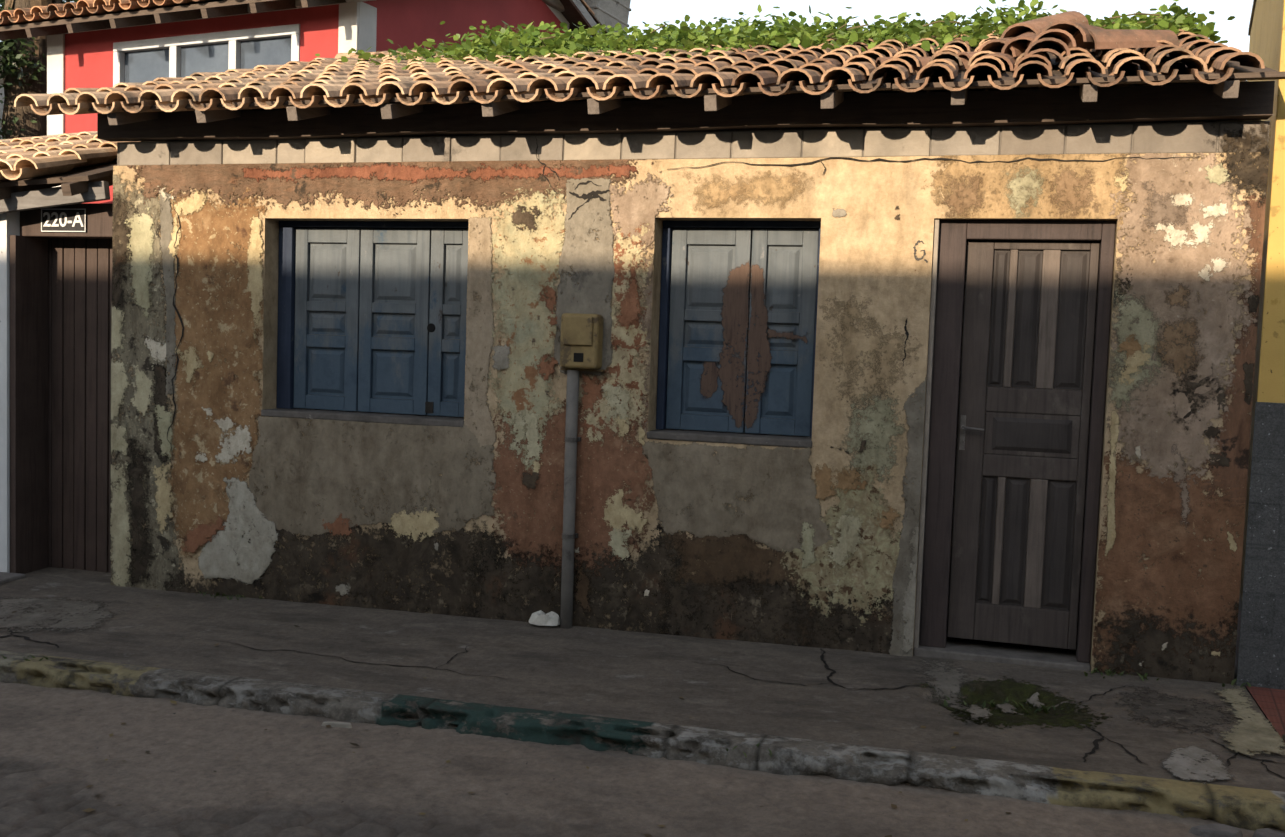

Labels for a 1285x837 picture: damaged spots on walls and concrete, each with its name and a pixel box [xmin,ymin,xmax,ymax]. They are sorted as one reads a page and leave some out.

peeling [127,159,658,576]
damp [110,170,920,654]
crack [535,136,610,220]
peeling [700,262,809,429]
peeling [779,295,916,626]
peeling [1106,152,1266,508]
damp [1172,363,1221,431]
damp [1093,602,1239,684]